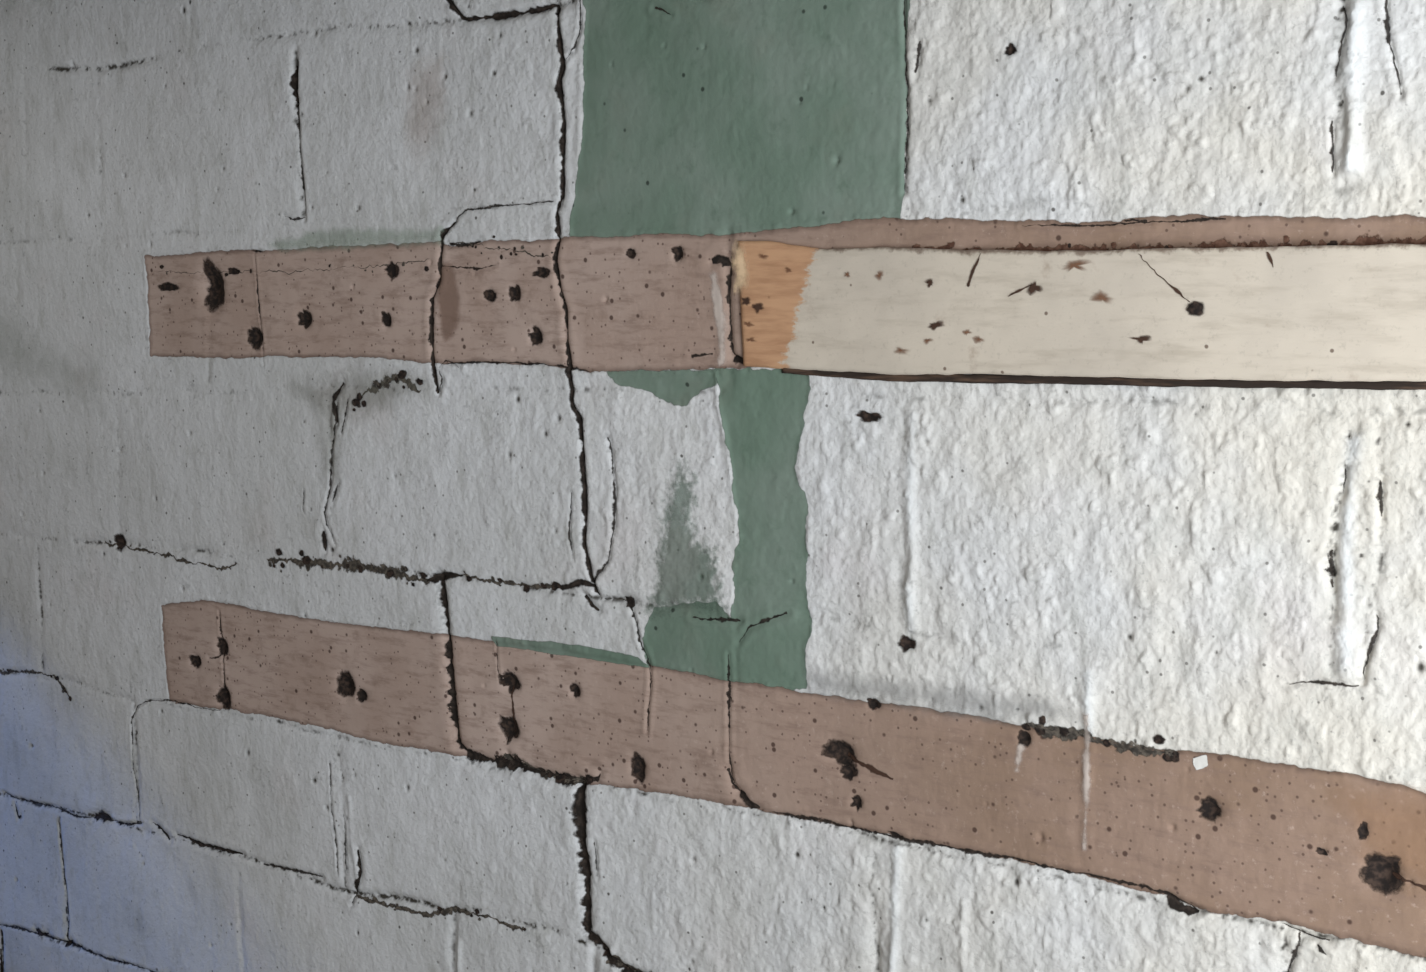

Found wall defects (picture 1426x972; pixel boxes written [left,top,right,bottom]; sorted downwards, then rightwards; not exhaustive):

crack [1383,0,1402,95]
crack [285,66,307,221]
peeling [144,0,1426,373]
crack [428,0,652,731]
crack [691,255,743,364]
crack [1325,550,1337,587]
crack [1343,469,1383,516]
peeling [161,367,1426,958]
crack [1289,615,1379,687]
crack [0,618,362,972]
crack [427,571,641,972]
spalling [603,947,652,972]